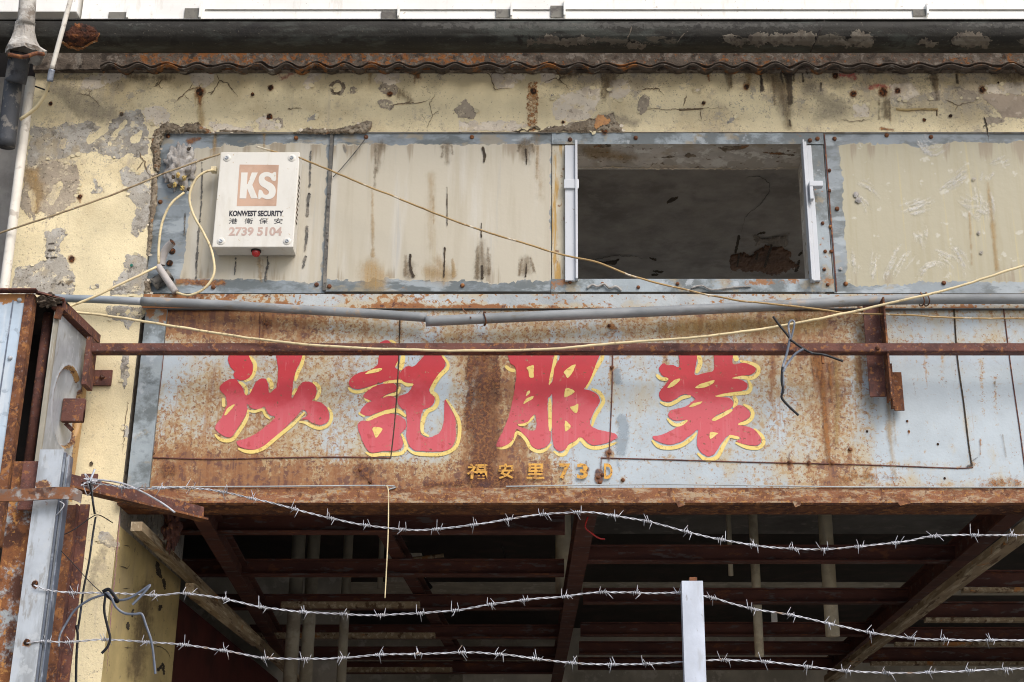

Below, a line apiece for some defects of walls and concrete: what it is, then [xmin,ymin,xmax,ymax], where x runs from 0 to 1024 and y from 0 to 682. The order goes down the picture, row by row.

rust [519,82,538,153]
peeling [454,73,651,148]
peeling [12,106,372,330]
rust [424,356,521,488]
rust [587,449,612,483]
rust [811,356,838,465]